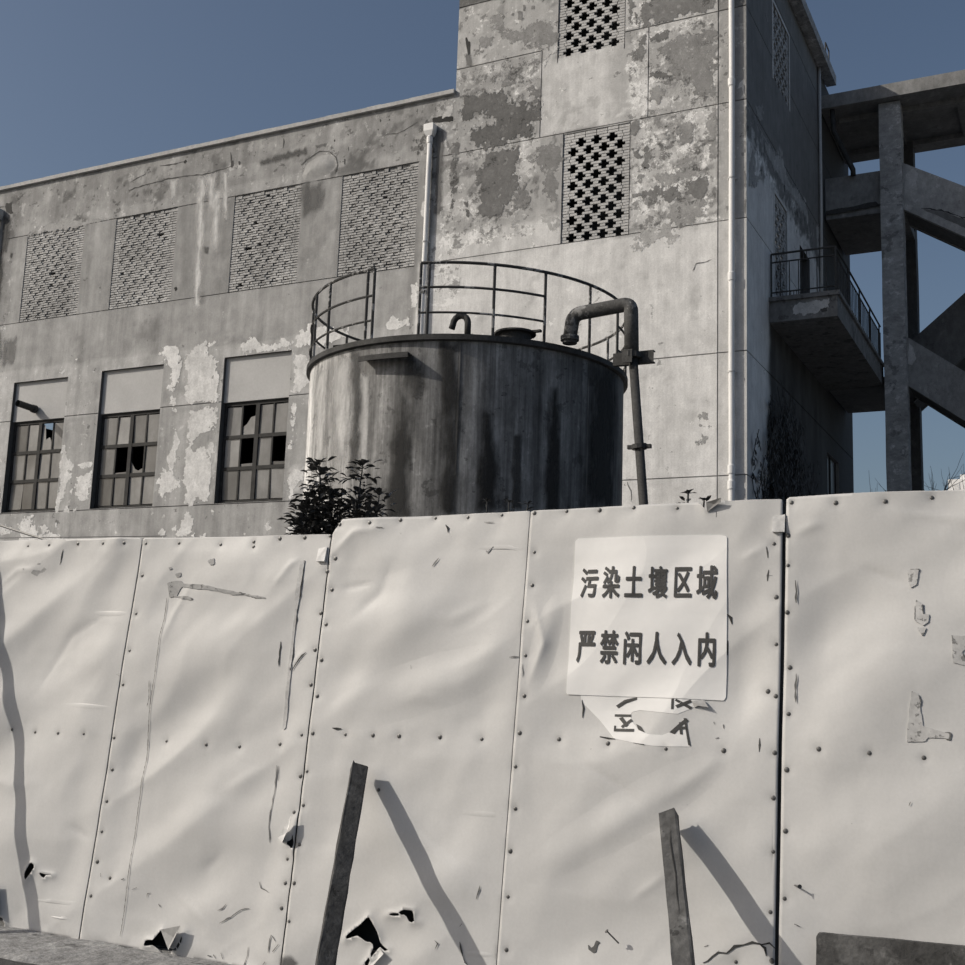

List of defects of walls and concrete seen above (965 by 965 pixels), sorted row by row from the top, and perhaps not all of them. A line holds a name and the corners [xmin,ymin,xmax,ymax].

water stain [195,173,227,306]
peeling [386,282,419,330]
peeling [0,445,93,540]
peeling [156,340,221,538]
peeling [240,323,349,449]
corrosion [316,351,369,473]
corrosion [387,399,410,517]
corrosion [439,342,460,513]
corrosion [478,415,498,510]
corrosion [546,390,560,510]
corrosion [588,366,616,507]
crack [703,941,775,963]